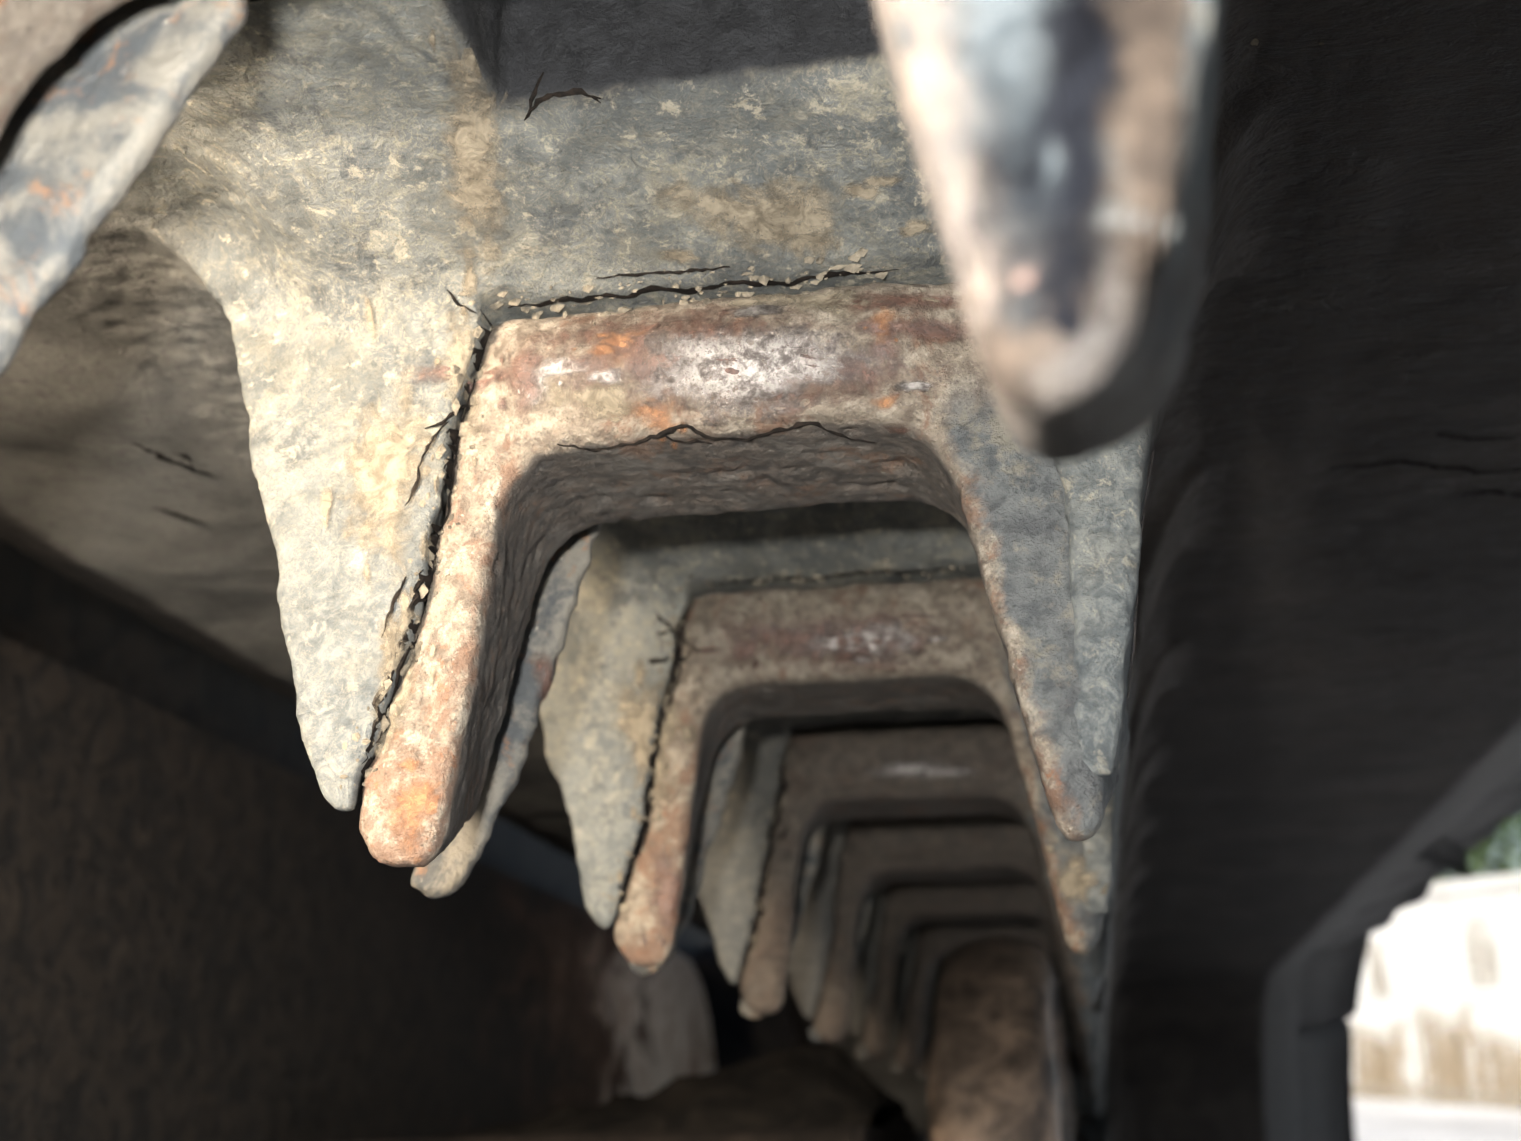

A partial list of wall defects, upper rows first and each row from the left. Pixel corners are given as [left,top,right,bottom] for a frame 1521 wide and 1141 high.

crack [524,72,601,121]
rust [839,293,969,341]
rust [420,309,774,449]
rust [753,323,898,414]
crack [340,248,919,790]
rust [535,658,557,702]
rust [721,613,936,670]
crack [602,558,964,914]